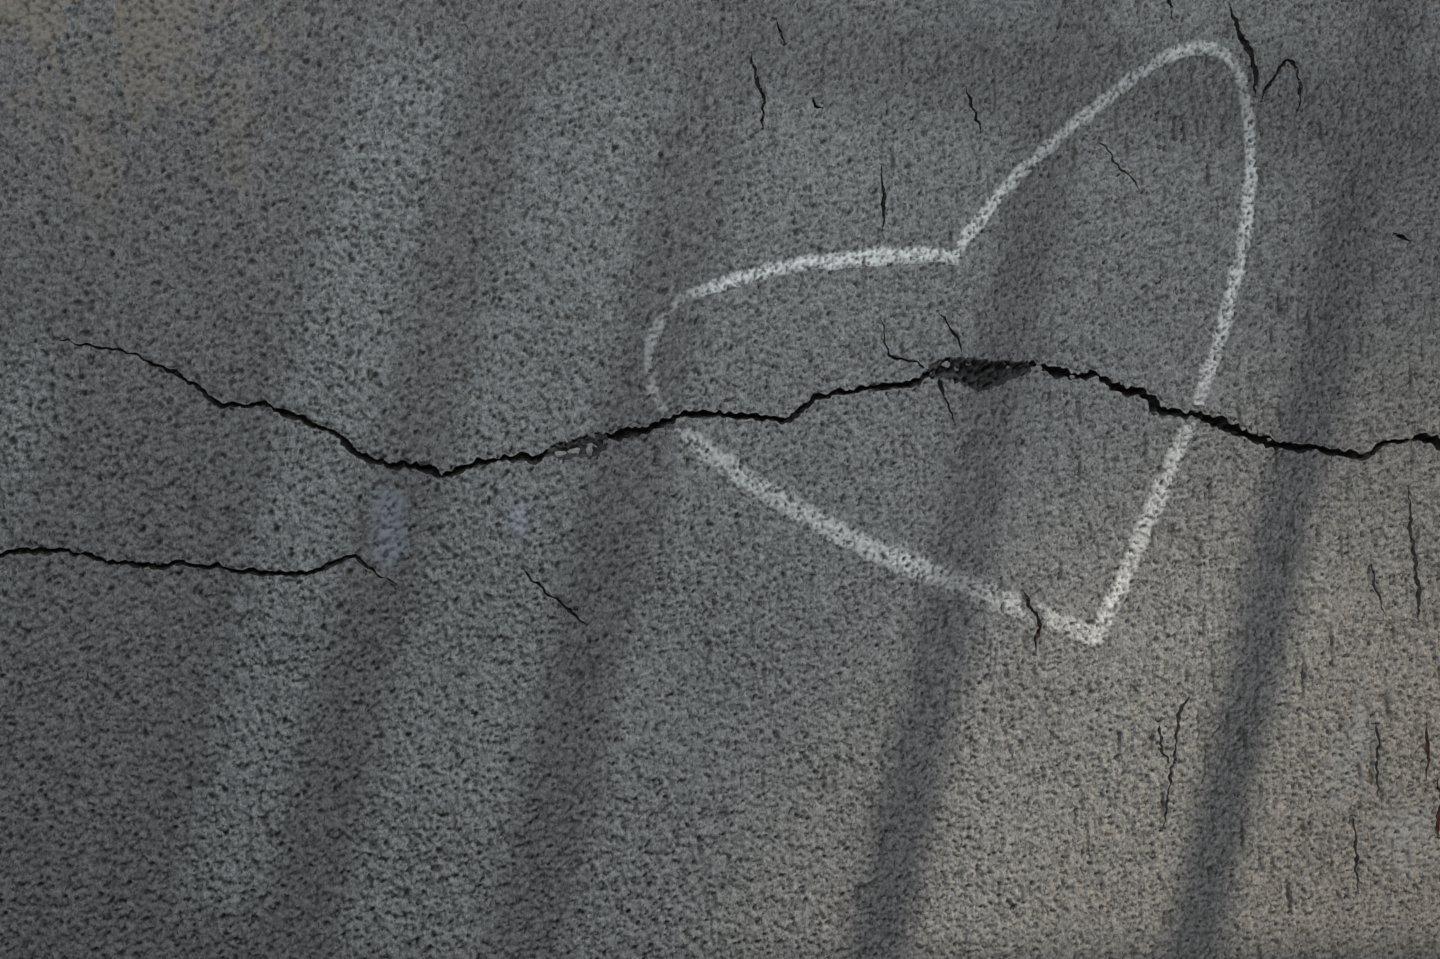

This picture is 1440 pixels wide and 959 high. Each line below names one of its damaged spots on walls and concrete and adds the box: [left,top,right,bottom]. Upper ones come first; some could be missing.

crack [1229,2,1303,110]
crack [60,312,1440,478]
crack [0,547,396,584]